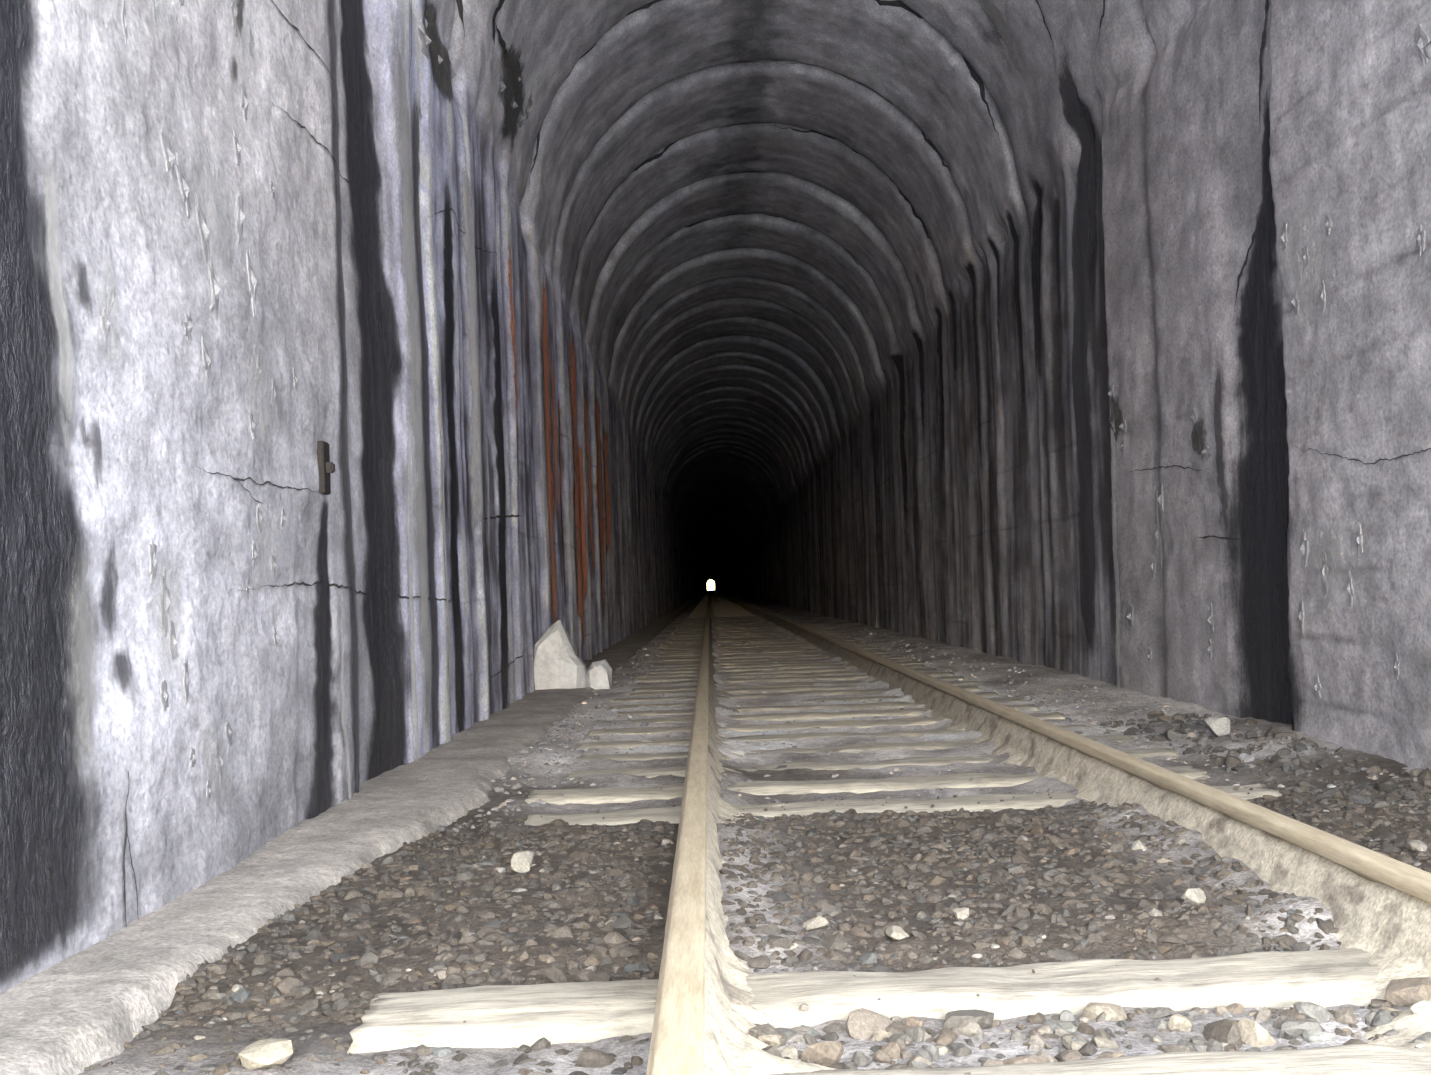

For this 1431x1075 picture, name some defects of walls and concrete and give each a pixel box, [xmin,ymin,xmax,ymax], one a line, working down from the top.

spalling [418,2,456,102]
crack [409,0,516,96]
spalling [497,45,533,149]
leakage [0,0,132,982]
crack [196,466,315,505]
leakage [307,0,509,819]
corrosion [508,249,612,642]
leakage [1214,102,1302,730]
crack [1294,445,1431,465]